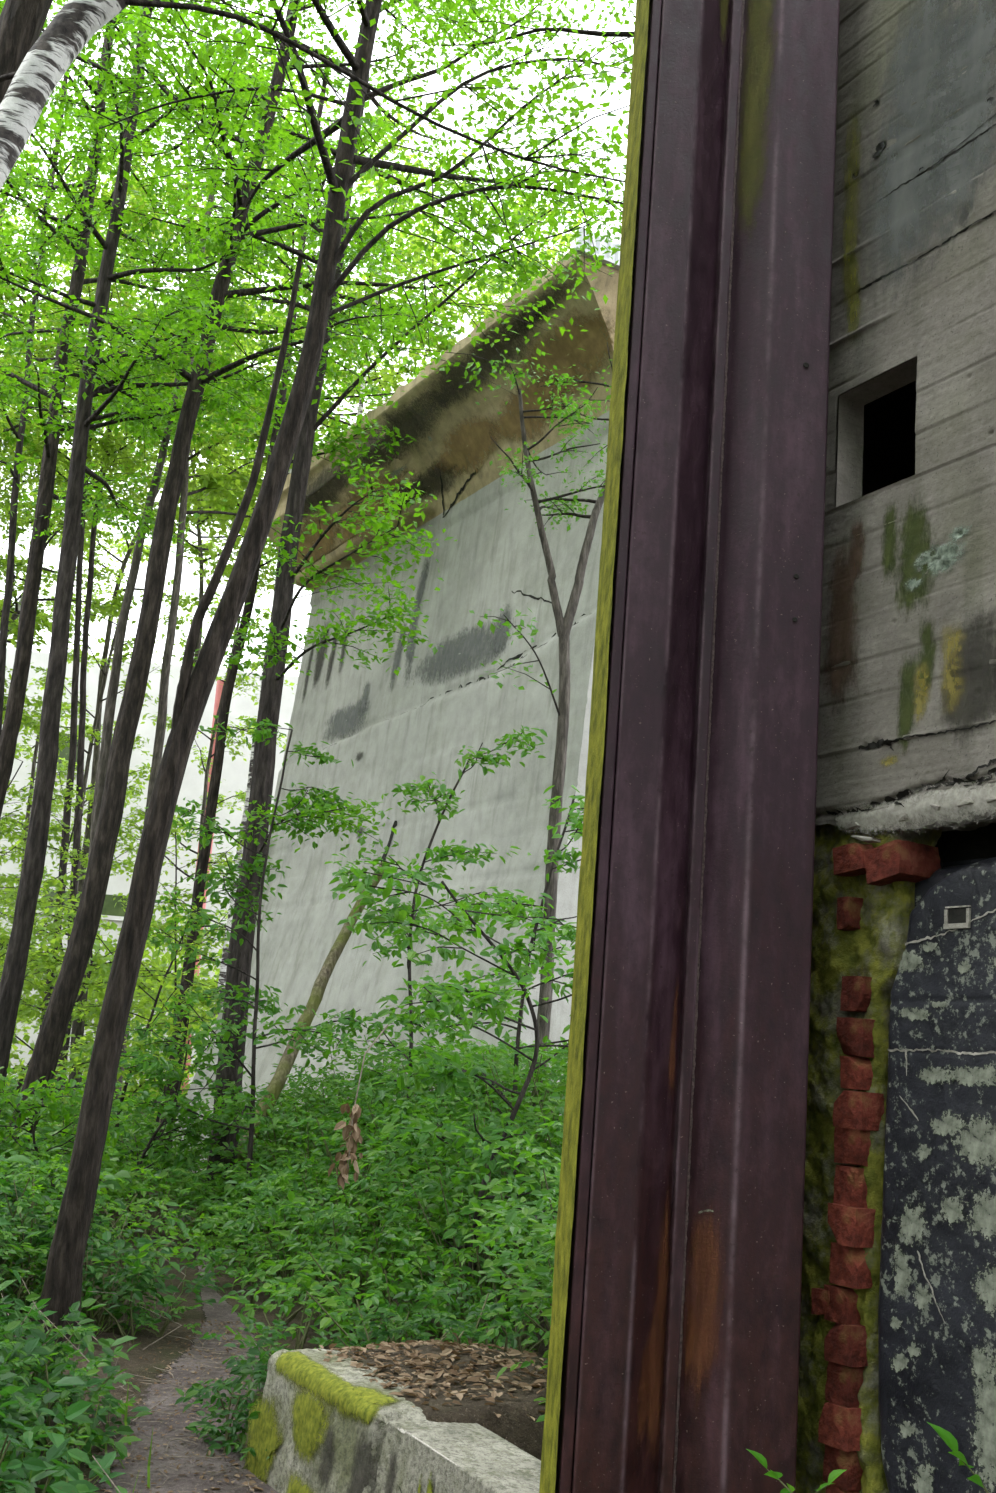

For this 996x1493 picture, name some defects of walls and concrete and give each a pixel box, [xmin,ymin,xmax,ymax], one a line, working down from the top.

water stain [882,503,935,611]
water stain [826,523,864,702]
water stain [882,614,996,766]
water stain [319,1432,334,1484]
water stain [347,1439,396,1493]